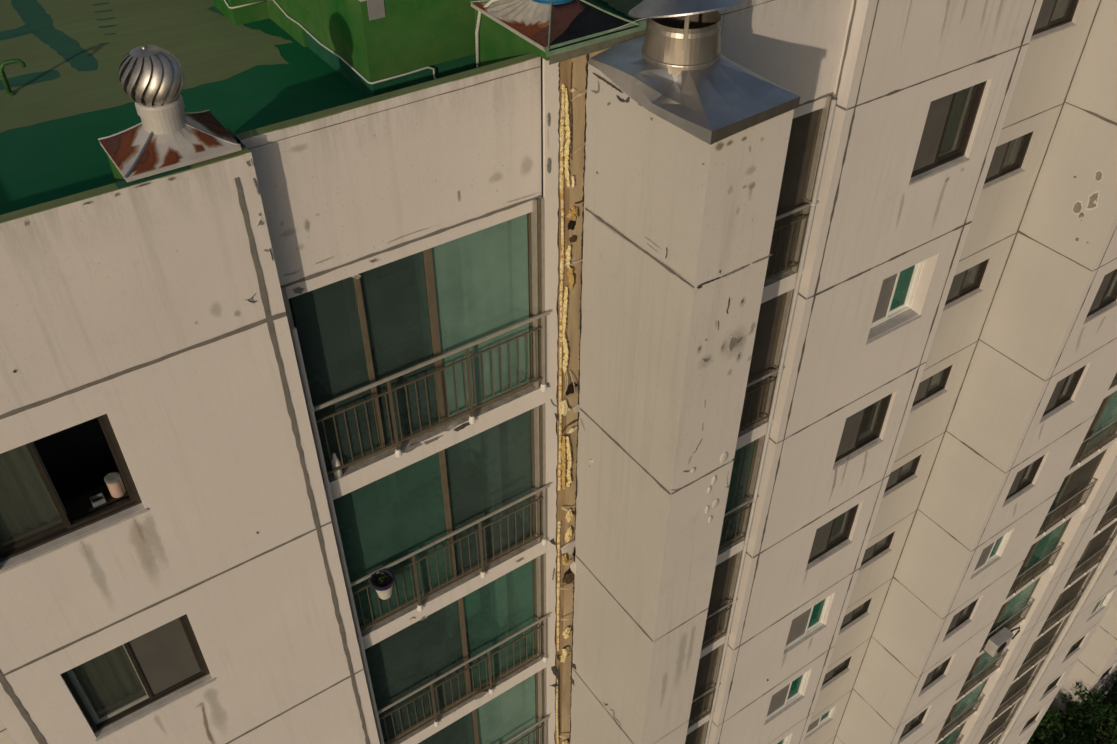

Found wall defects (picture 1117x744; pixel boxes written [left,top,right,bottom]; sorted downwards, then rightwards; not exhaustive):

rust [472,0,594,49]
rust [99,125,181,176]
rust [187,111,237,152]
peeling [1072,169,1103,221]
spalling [550,538,577,584]
spalling [550,655,576,687]